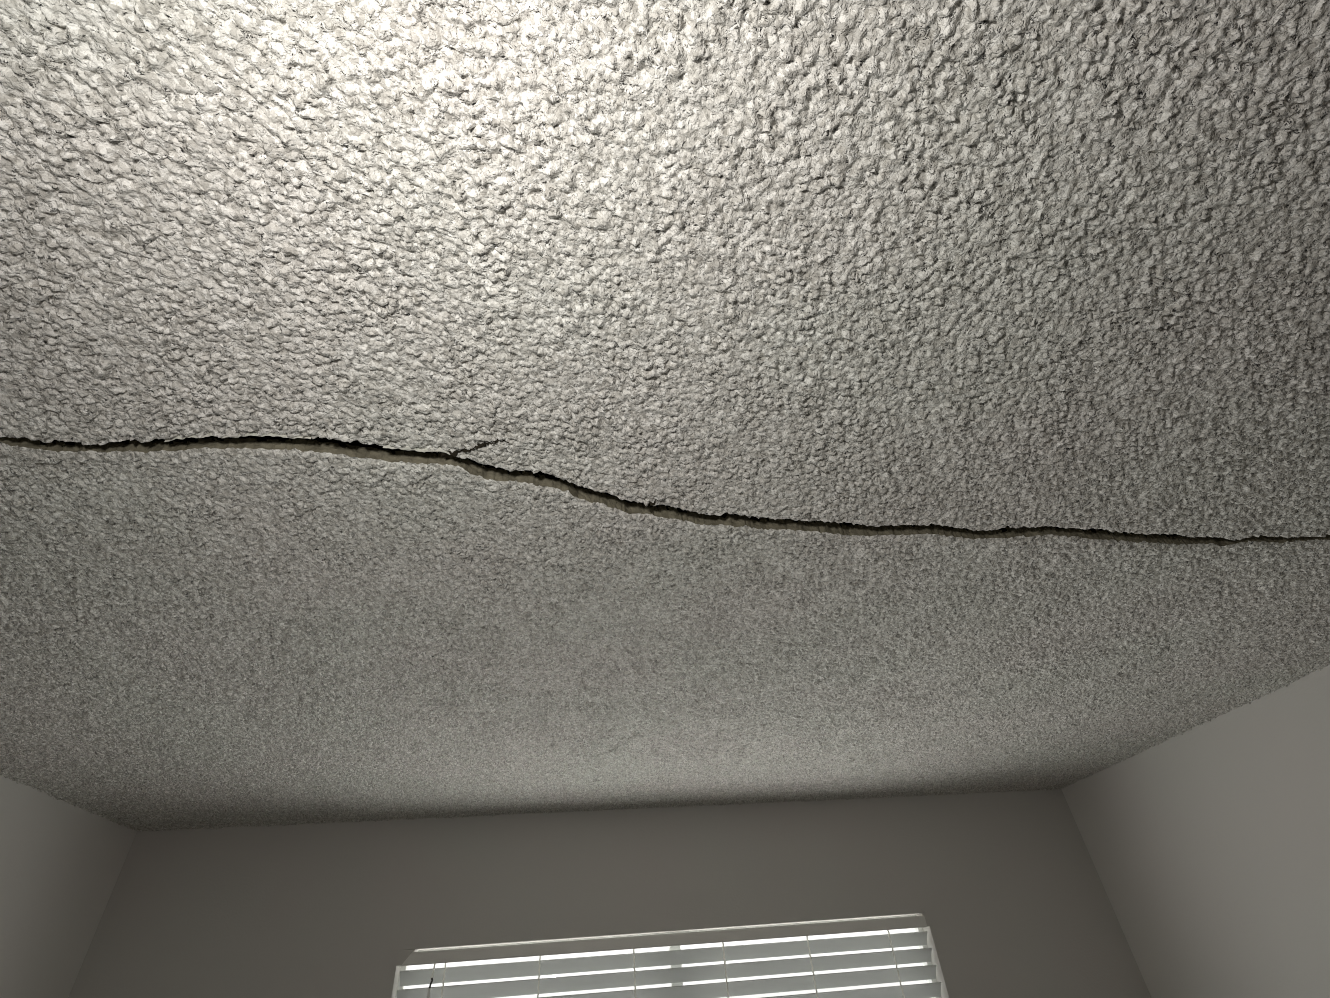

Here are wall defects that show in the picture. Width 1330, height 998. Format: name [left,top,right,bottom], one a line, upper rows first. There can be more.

crack [0,432,1330,546]